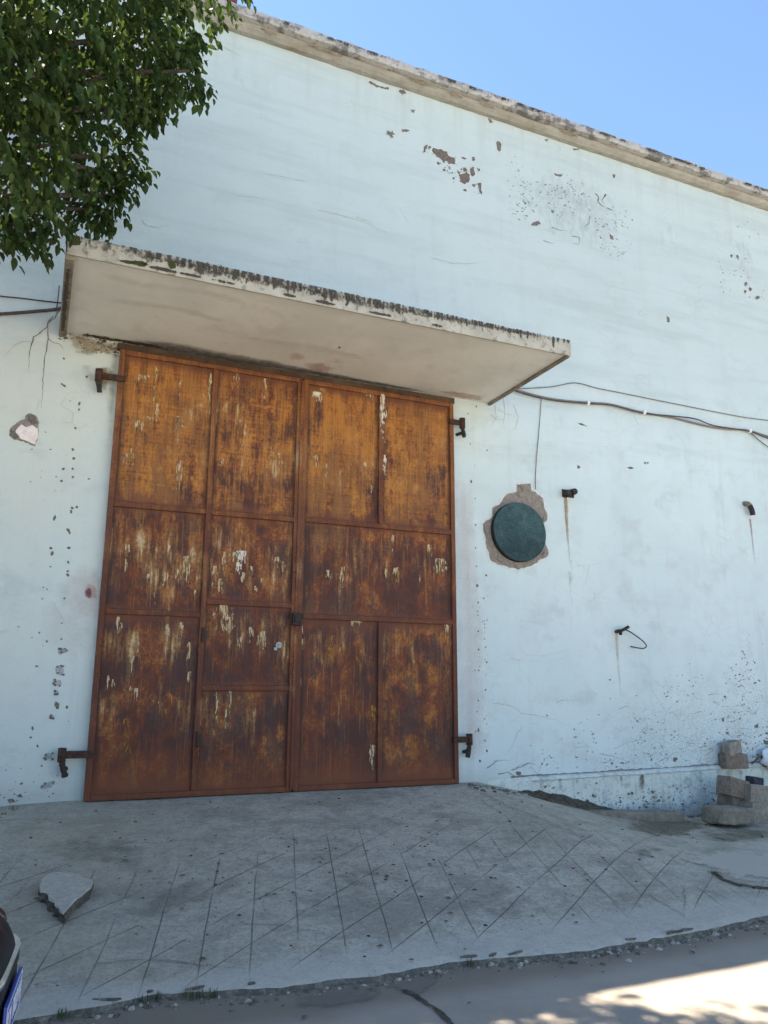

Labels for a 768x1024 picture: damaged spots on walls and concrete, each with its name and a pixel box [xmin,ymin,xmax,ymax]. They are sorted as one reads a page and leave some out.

peeling [422,144,483,195]
crack [10,310,63,407]
peeling [9,413,46,450]
peeling [31,632,69,722]
peeling [0,775,62,803]
crack [467,700,738,919]
crack [402,989,454,1024]